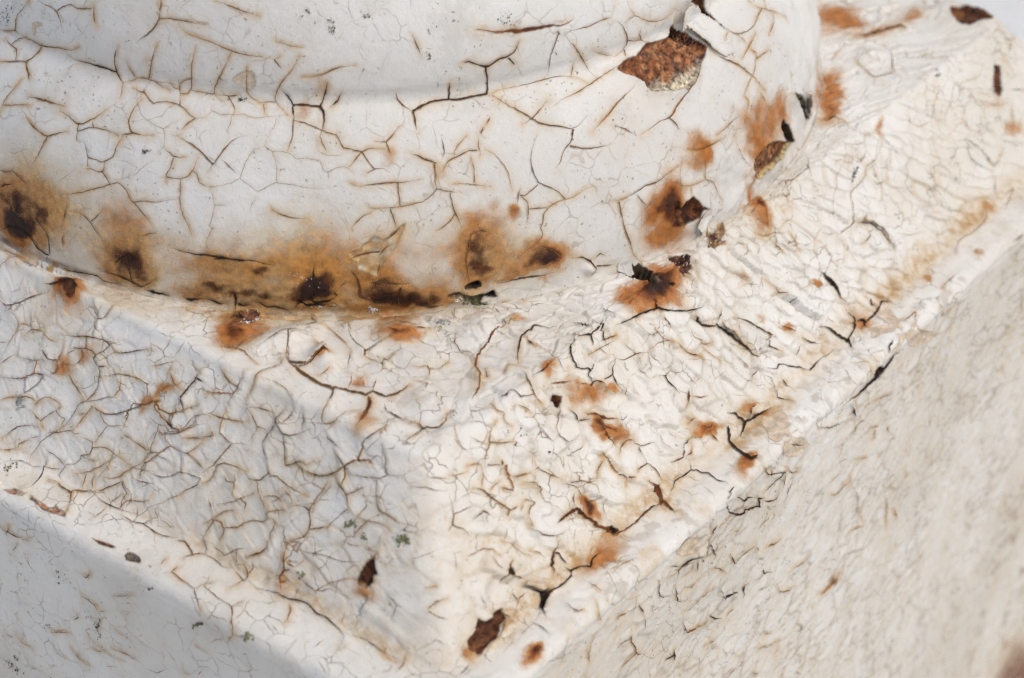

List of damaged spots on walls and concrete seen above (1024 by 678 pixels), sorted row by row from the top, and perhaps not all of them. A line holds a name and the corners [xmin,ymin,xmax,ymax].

peeling [618,5,735,91]
crack [831,24,920,77]
peeling [950,4,994,25]
corrosion [644,179,685,249]
corrosion [178,213,569,348]
corrosion [615,264,684,315]
crack [0,0,795,675]
crack [550,272,897,460]
crack [823,340,903,529]
peeling [358,556,377,588]
peeling [467,608,516,662]
corrosion [522,642,544,665]